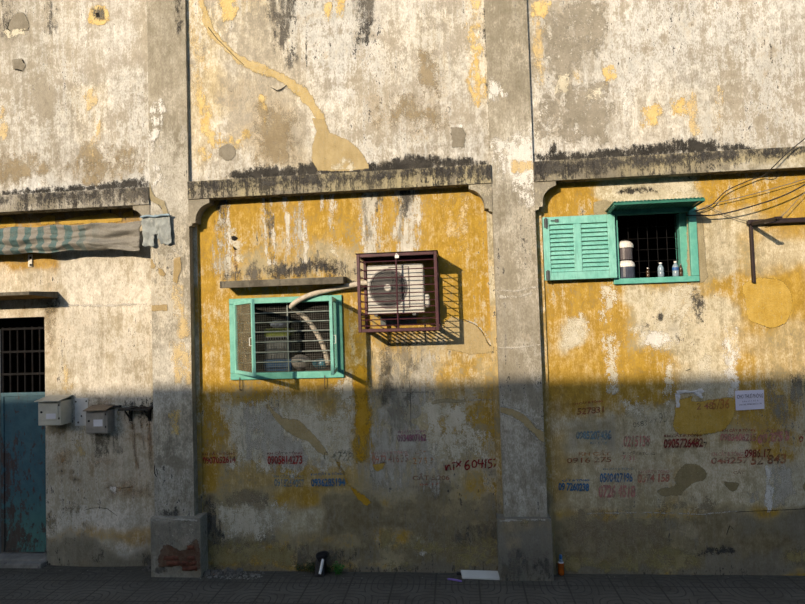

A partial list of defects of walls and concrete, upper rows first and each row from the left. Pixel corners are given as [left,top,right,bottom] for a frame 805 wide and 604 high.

spalling [88,5,109,25]
water stain [265,0,298,68]
peeling [324,0,345,21]
water stain [356,0,375,44]
peeling [188,26,253,165]
water stain [533,88,805,178]
water stain [0,141,149,206]
water stain [187,101,491,281]
peeling [225,350,491,496]
spalling [157,539,200,571]